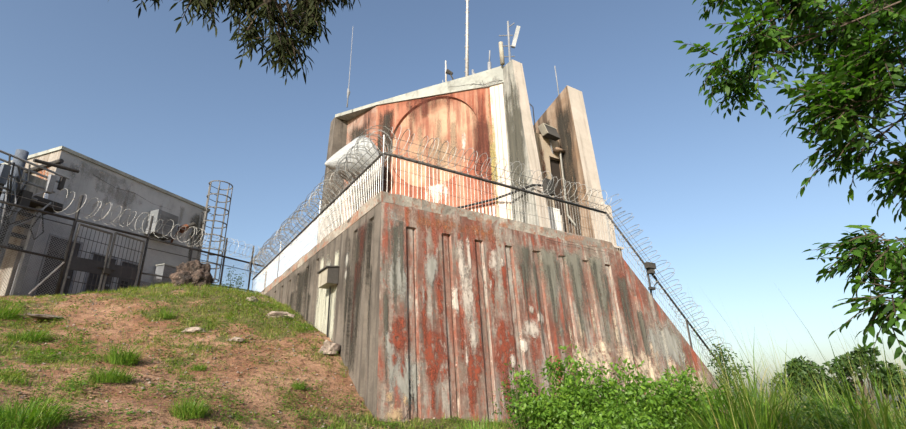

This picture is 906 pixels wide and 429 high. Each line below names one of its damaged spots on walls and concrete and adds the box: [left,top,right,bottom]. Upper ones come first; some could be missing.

rust [408,95,449,137]
rust [472,95,491,188]
rust [389,317,408,376]
rust [406,209,505,411]
rust [488,265,515,419]